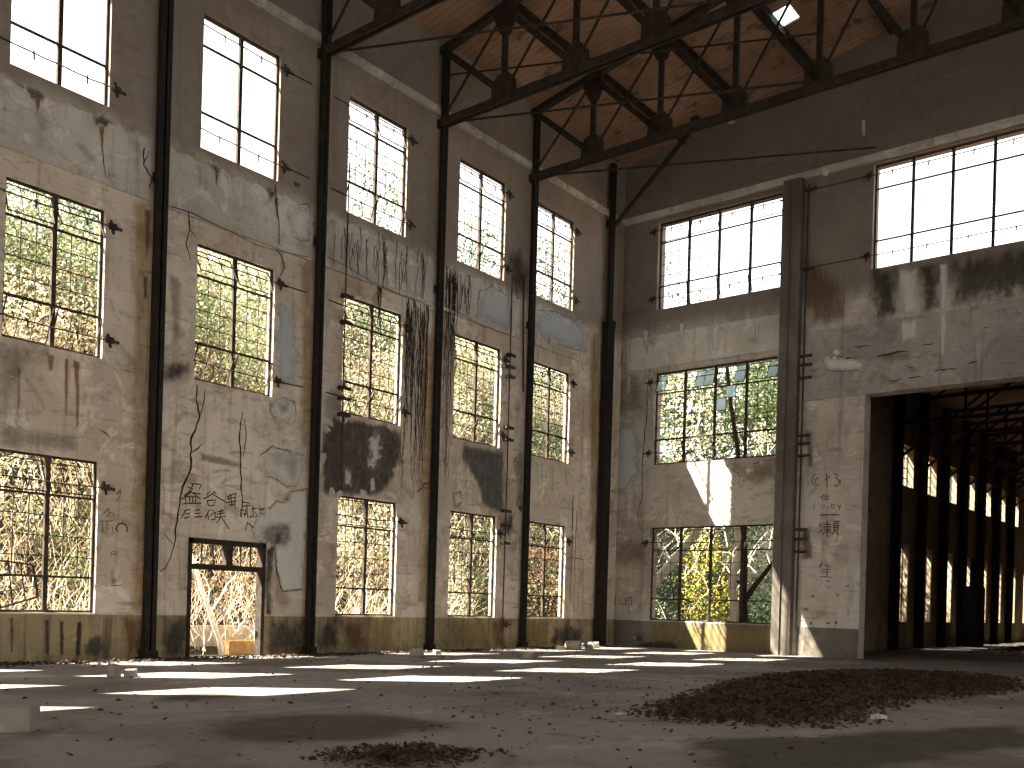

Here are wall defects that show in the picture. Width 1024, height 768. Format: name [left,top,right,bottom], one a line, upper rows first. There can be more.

damp [873,251,1024,355]
rust [48,355,79,426]
crack [160,384,206,572]
crack [239,412,247,517]
damp [320,416,402,499]
damp [463,447,503,509]
damp [45,621,64,654]
damp [319,619,336,650]